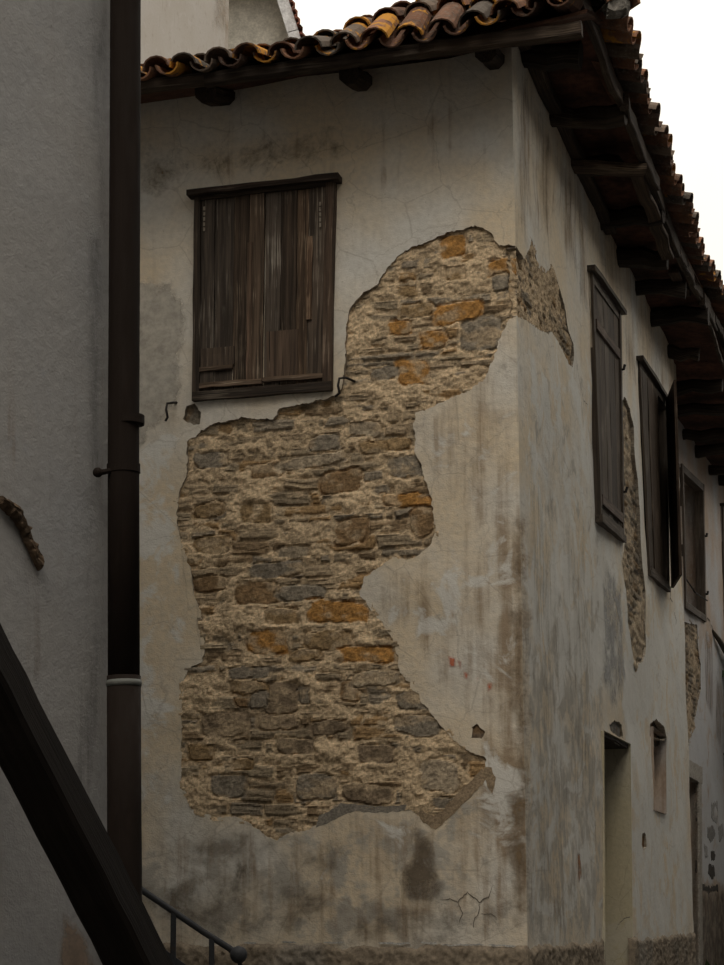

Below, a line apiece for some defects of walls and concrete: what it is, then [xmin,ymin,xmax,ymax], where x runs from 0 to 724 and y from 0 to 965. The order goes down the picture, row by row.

peeling [139,283,185,443]
spalling [173,226,574,841]
spalling [622,397,646,672]
spalling [684,619,701,746]
damp [404,837,439,898]
crack [444,888,497,928]
damp [512,796,525,890]
peeling [695,800,724,894]